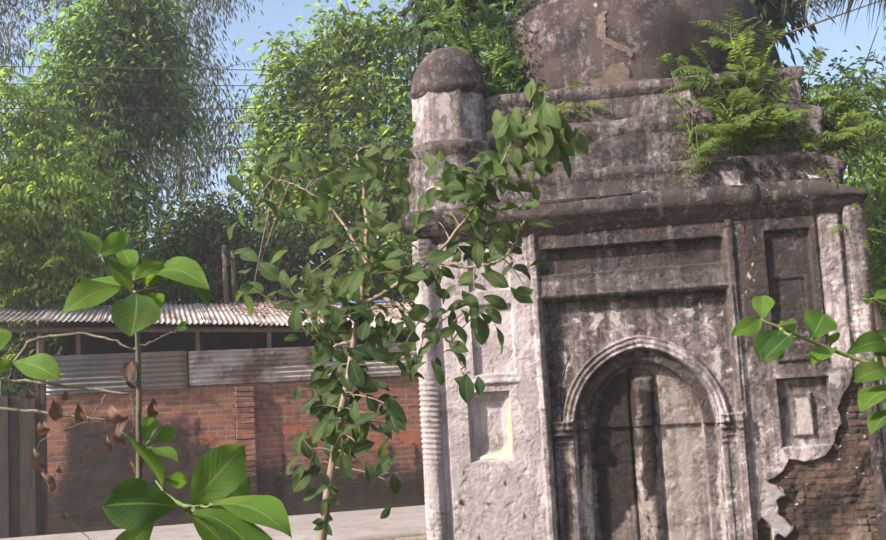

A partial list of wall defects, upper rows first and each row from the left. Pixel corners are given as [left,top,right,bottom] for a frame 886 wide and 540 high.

flaking render [832,223,848,352]
leakage [591,367,659,540]
spalling [757,370,880,540]